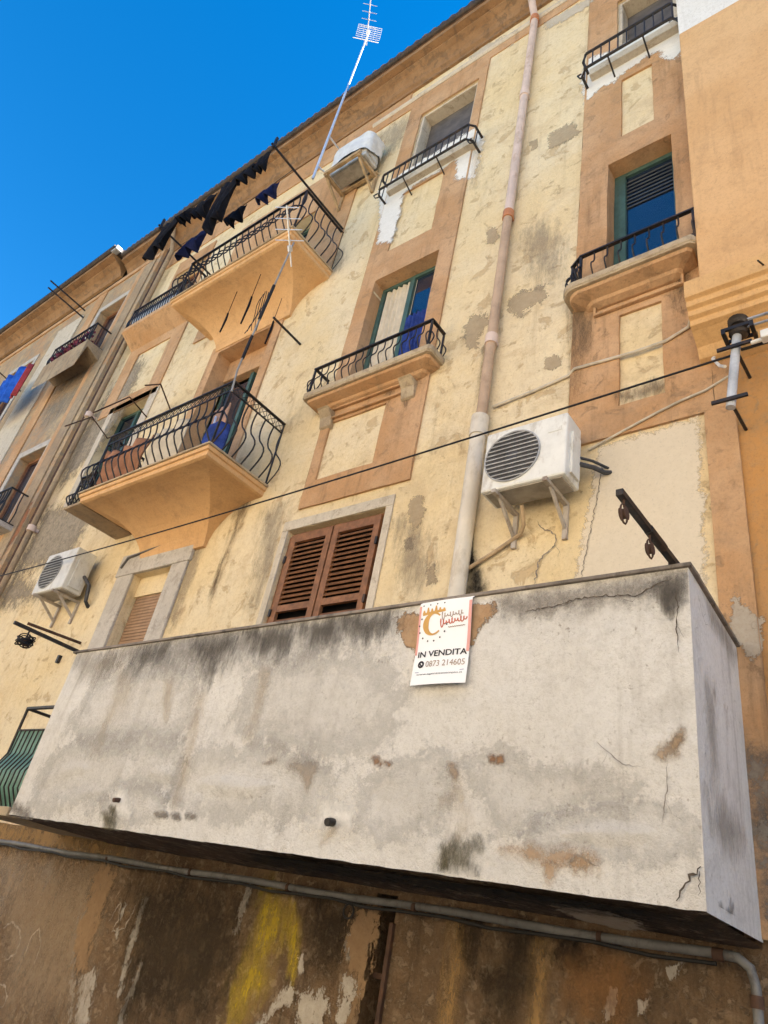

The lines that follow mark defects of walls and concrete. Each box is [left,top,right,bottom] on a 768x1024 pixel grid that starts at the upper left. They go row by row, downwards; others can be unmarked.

peeling [529,122,581,151]
peeling [507,283,549,318]
crack [525,467,707,652]
damp [251,614,389,651]
spalling [391,611,419,659]
spalling [469,601,499,649]
peeling [728,592,766,663]
spalling [656,727,683,760]
damp [246,837,694,923]
crack [676,866,701,901]
damp [289,897,358,978]
peeling [255,905,384,1024]